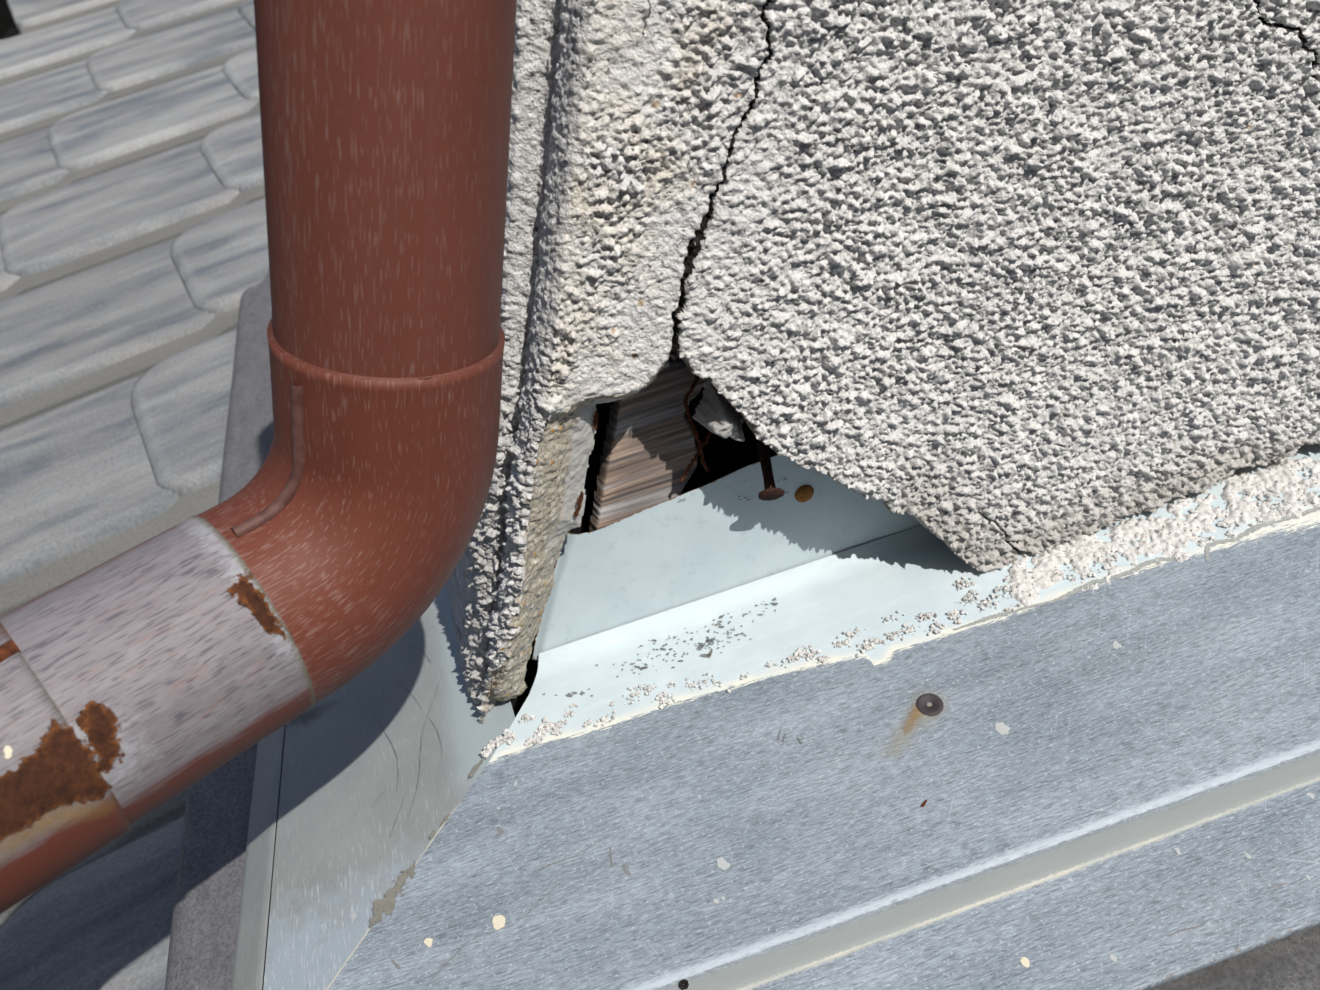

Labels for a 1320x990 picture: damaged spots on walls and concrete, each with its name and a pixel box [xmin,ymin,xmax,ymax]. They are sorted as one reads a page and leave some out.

crack [642,0,651,35]
crack [1253,0,1320,110]
crack [669,0,773,361]
corrosion [227,569,286,640]
spalling [476,347,981,724]
corrosion [0,700,125,842]